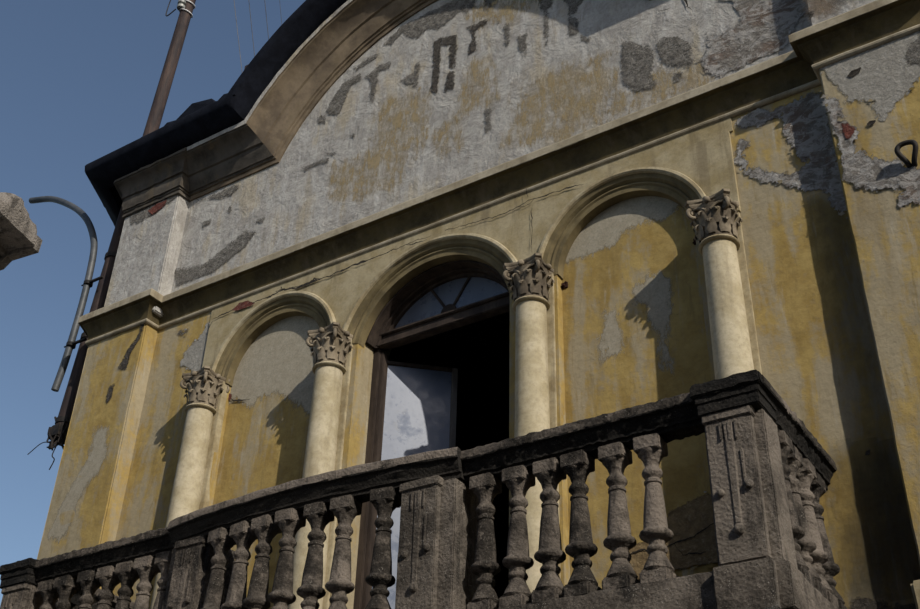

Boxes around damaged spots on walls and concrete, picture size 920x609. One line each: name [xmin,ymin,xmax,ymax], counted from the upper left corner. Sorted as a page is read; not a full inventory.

flaking render [383,0,492,94]
flaking render [498,20,527,55]
flaking render [538,0,552,46]
flaking render [564,0,591,42]
flaking render [620,0,816,92]
flaking render [317,54,391,124]
flaking render [733,30,920,220]
flaking render [130,195,177,225]
flaking render [174,217,265,286]
crack [253,184,583,303]
flaking render [118,324,143,370]